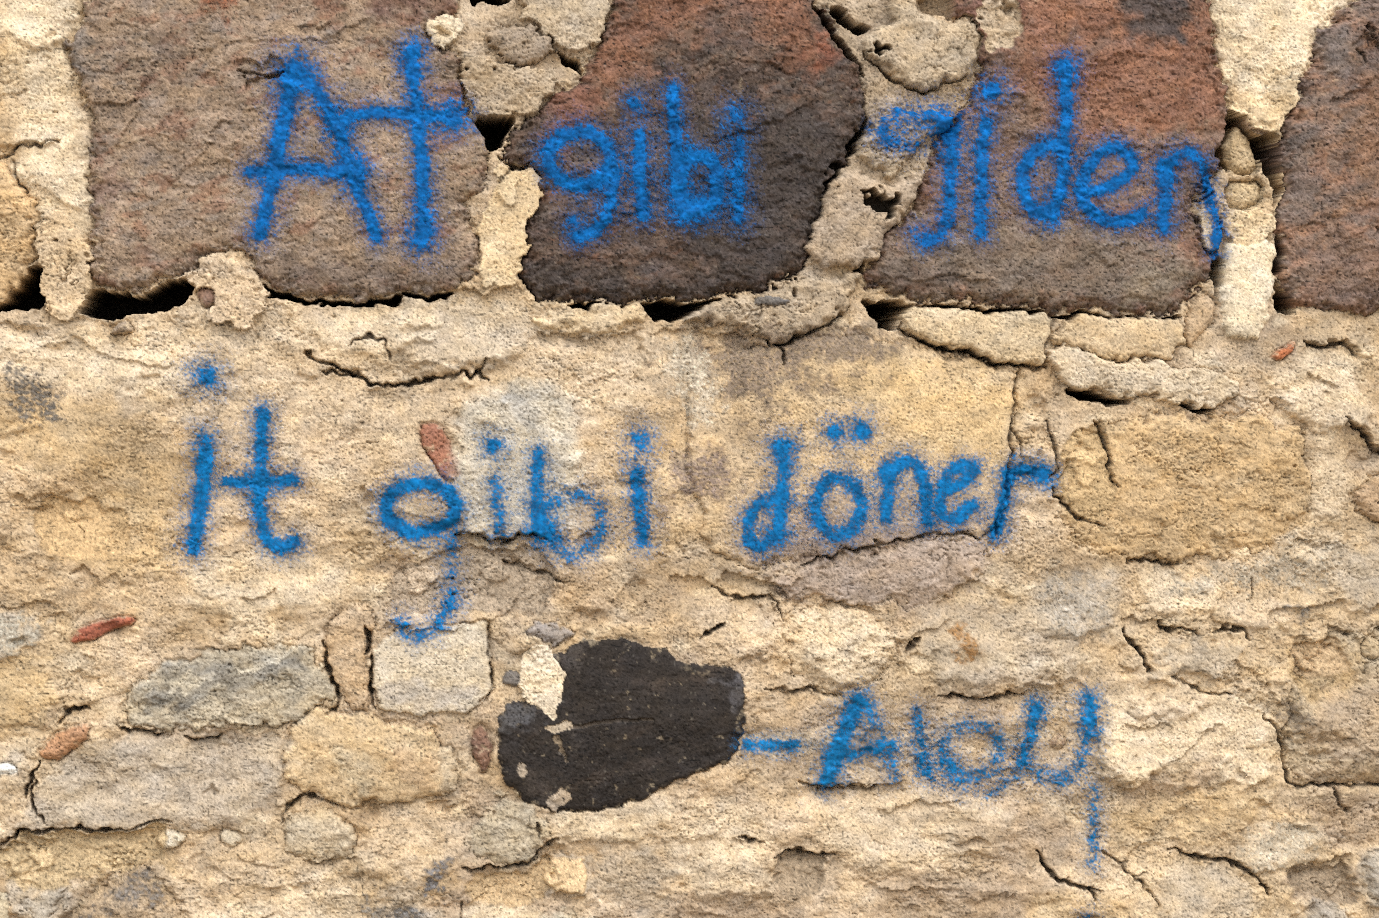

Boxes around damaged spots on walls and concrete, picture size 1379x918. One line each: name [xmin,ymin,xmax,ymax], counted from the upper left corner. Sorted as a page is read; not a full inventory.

crack [1039,856,1095,899]
crack [1186,853,1268,889]